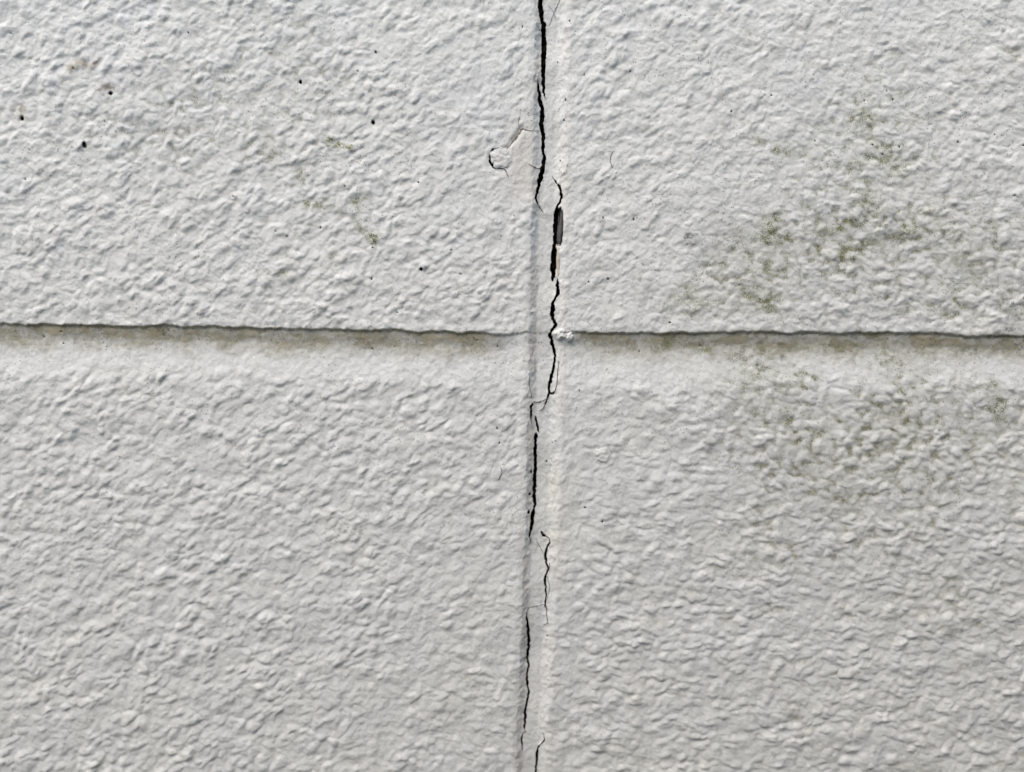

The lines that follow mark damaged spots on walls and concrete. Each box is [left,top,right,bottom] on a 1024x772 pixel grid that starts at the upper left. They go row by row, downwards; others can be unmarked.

crack [521,0,563,772]